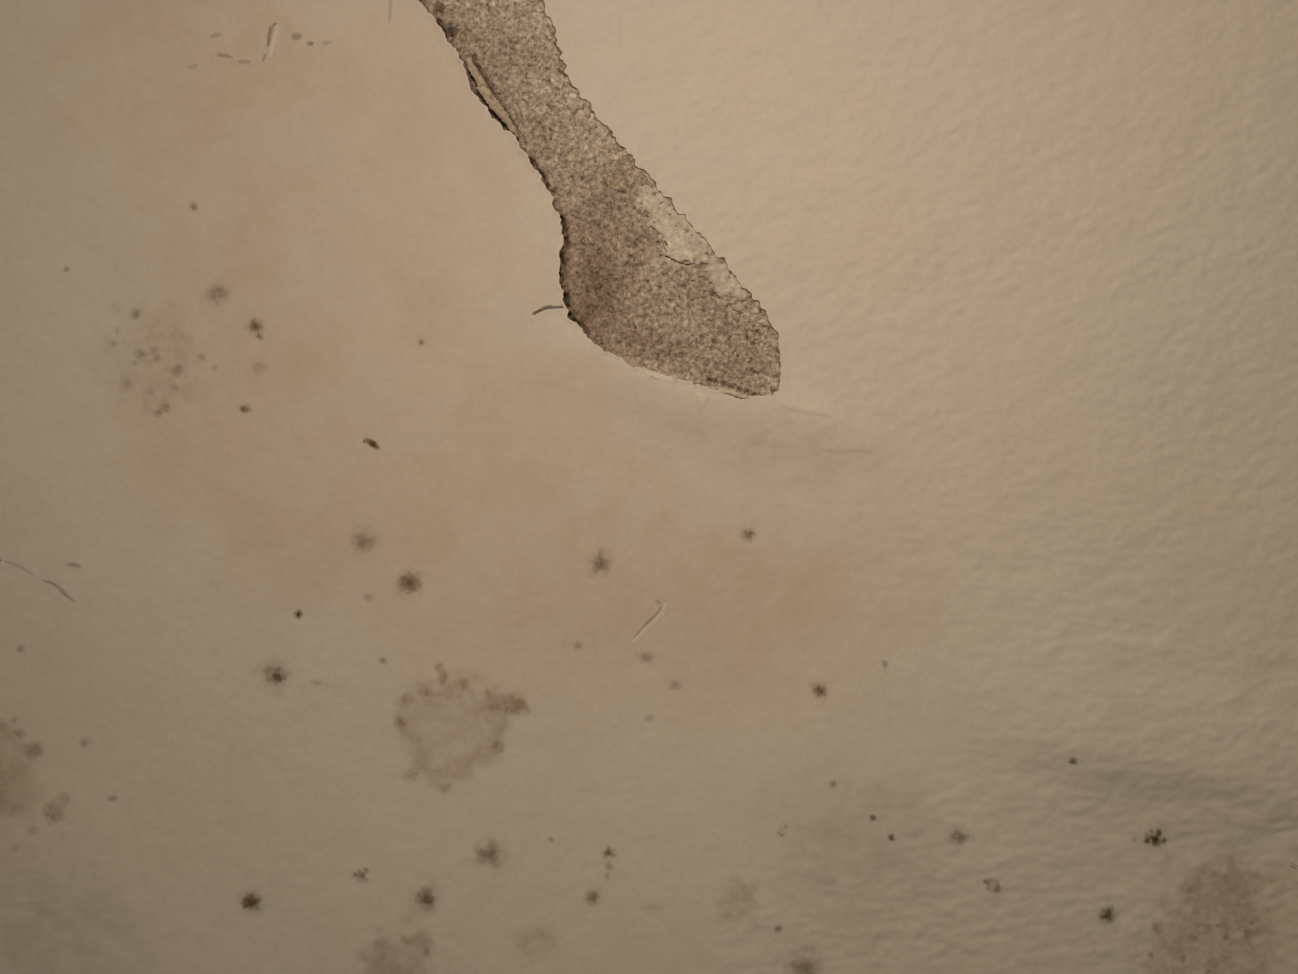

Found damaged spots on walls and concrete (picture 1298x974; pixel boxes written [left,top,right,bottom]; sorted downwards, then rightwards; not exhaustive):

peeling [410,0,790,406]